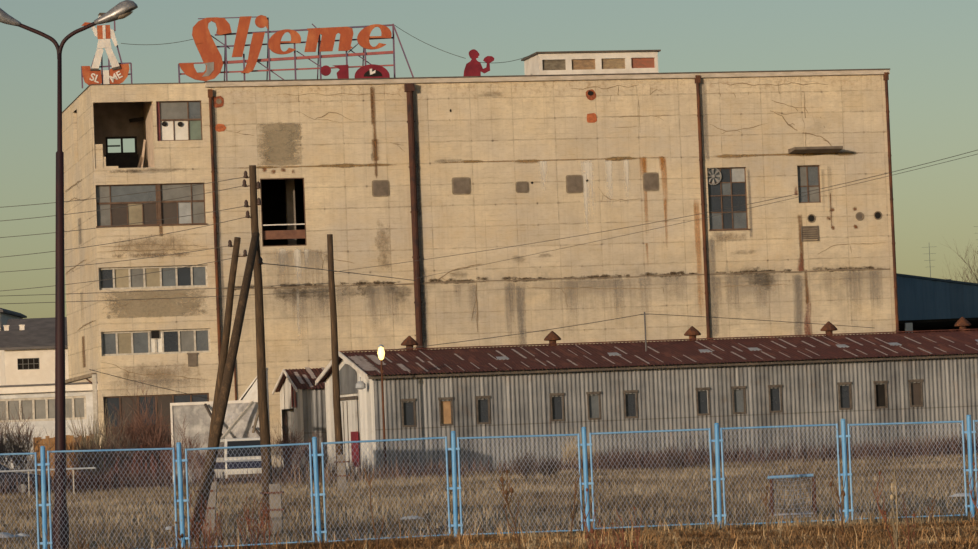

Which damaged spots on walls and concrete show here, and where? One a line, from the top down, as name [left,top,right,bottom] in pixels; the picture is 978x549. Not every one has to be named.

rust [257,89,389,176]
crack [278,93,403,122]
crack [710,82,831,145]
rust [796,219,811,335]
water stain [355,333,696,373]